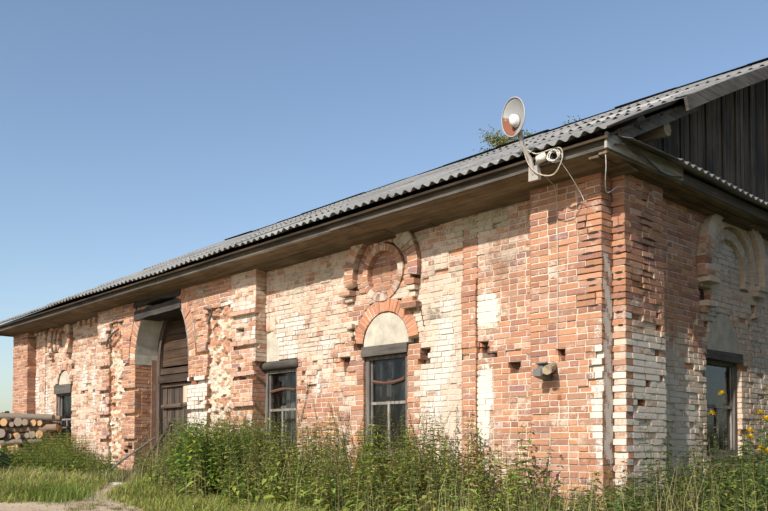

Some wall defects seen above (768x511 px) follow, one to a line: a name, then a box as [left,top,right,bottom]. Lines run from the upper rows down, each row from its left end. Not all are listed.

spalling [100,314,132,473]
spalling [192,296,246,437]